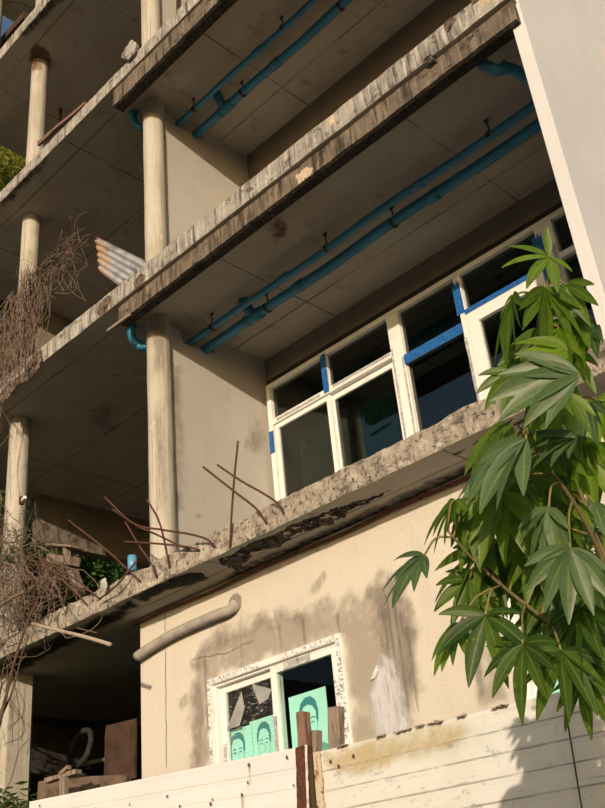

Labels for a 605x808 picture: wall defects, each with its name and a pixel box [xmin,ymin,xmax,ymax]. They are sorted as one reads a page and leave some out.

corrosion [29,45,50,70]
spalling [296,167,313,184]
spalling [218,490,390,570]
water stain [195,585,414,726]
corrosion [286,745,398,808]